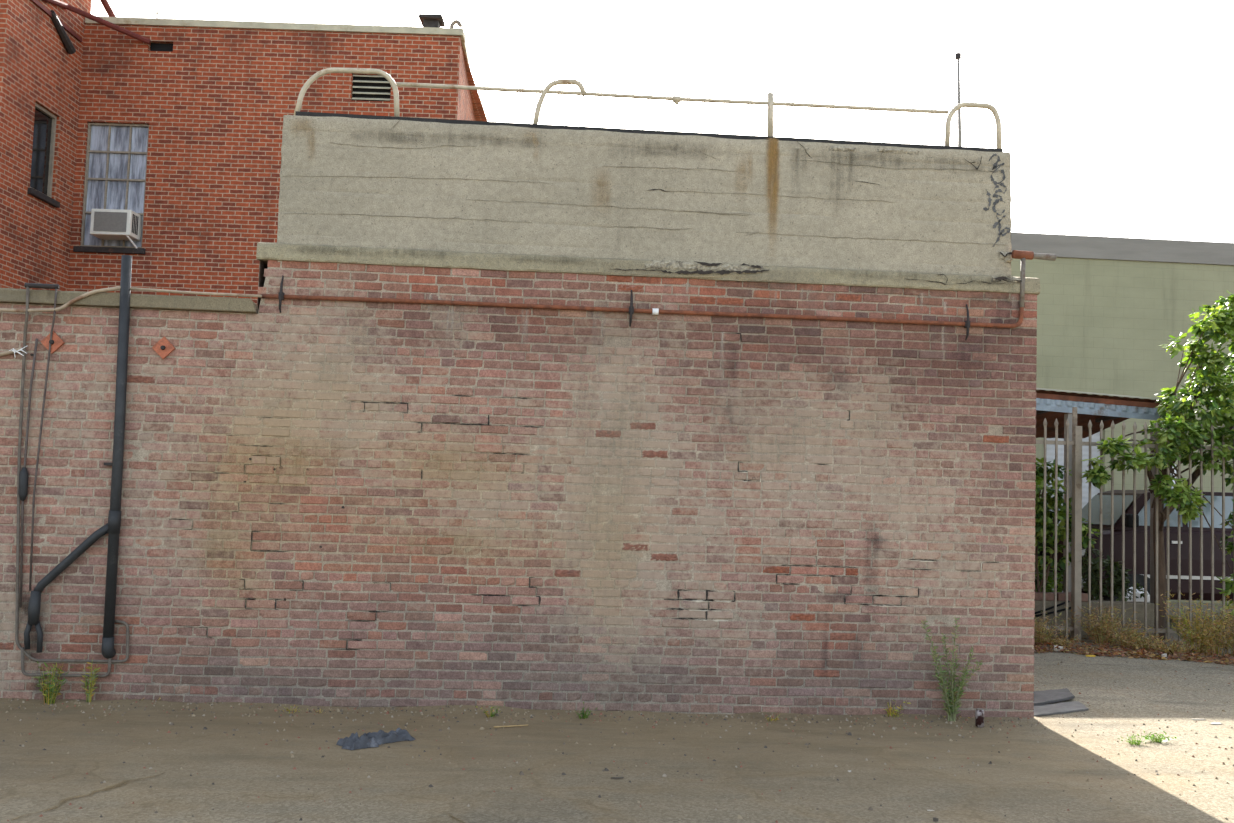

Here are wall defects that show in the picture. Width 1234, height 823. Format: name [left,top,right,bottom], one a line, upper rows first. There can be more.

crack [331,121,582,223]
crack [607,141,999,245]
spalling [606,260,769,292]